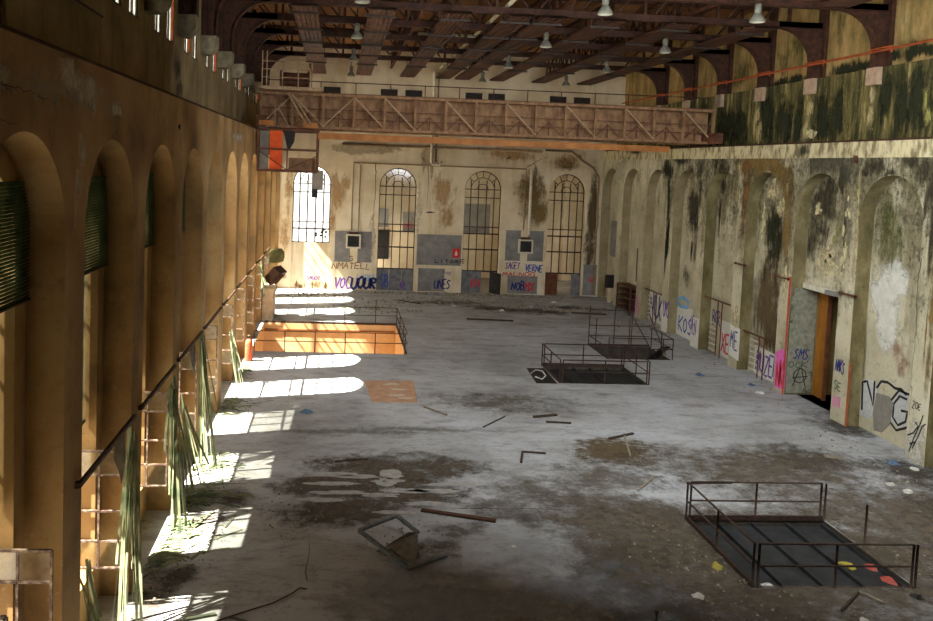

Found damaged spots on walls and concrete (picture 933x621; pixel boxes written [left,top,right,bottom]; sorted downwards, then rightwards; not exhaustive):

leakage [754,109,773,144]
leakage [866,87,883,125]
leakage [905,90,931,132]
leakage [491,151,548,225]
leakage [662,159,792,354]
leakage [796,102,896,282]
leakage [902,153,933,280]
leakage [785,288,818,393]
leakage [870,259,909,376]
leakage [924,292,933,384]